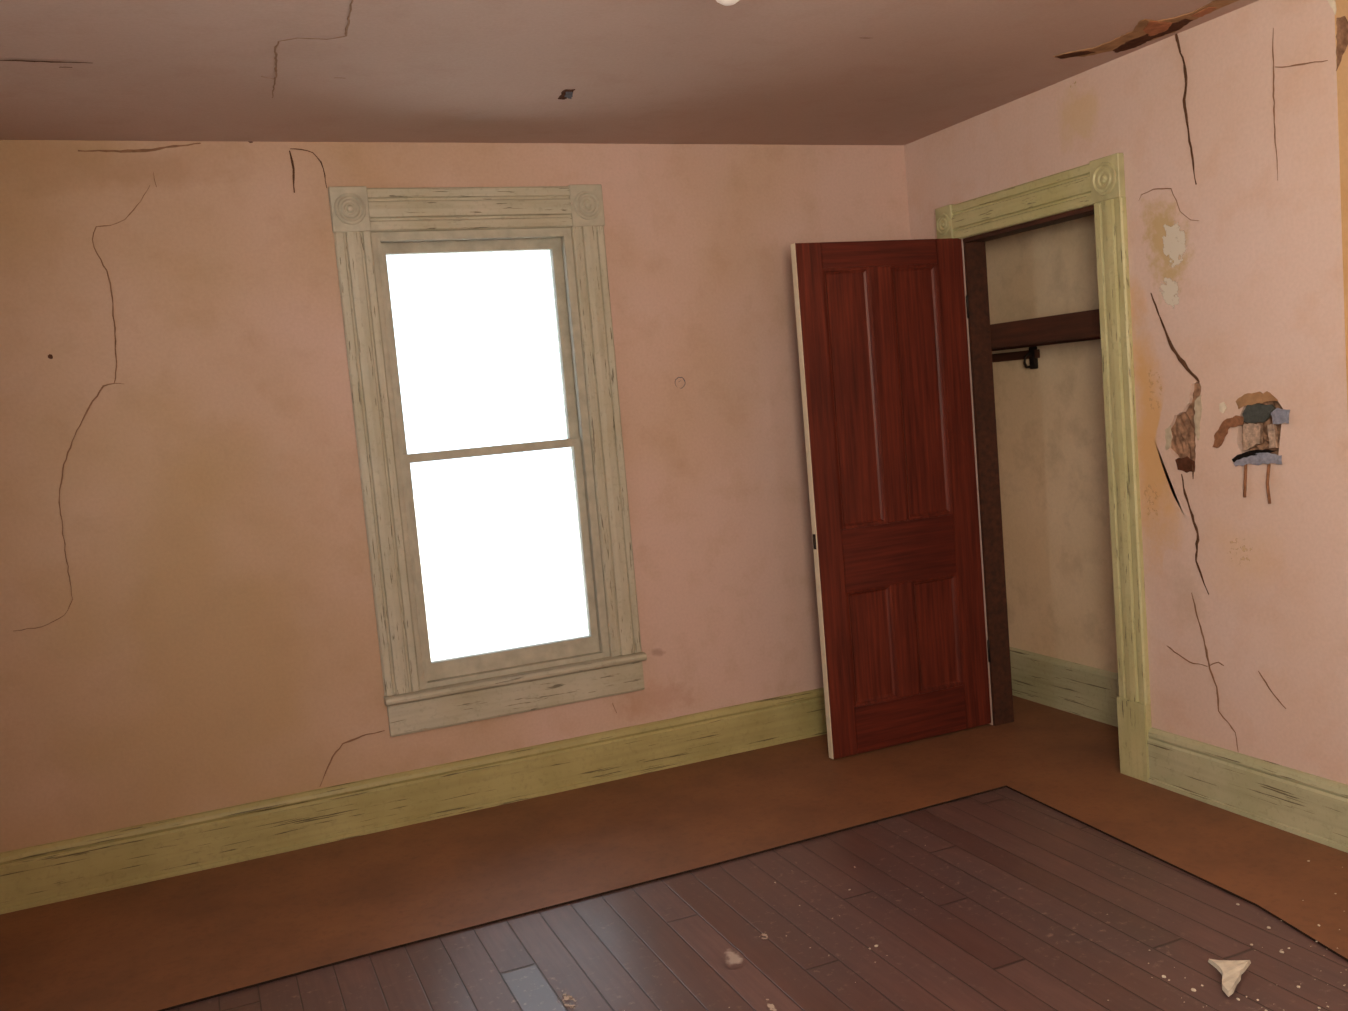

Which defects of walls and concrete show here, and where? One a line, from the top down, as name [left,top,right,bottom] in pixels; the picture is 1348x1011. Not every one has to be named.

crack [261,0,353,98]
flaking render [1327,0,1348,71]
crack [1175,34,1197,184]
crack [16,143,201,631]
crack [1150,293,1200,383]
flaking render [1165,383,1202,473]
crack [1167,464,1238,750]